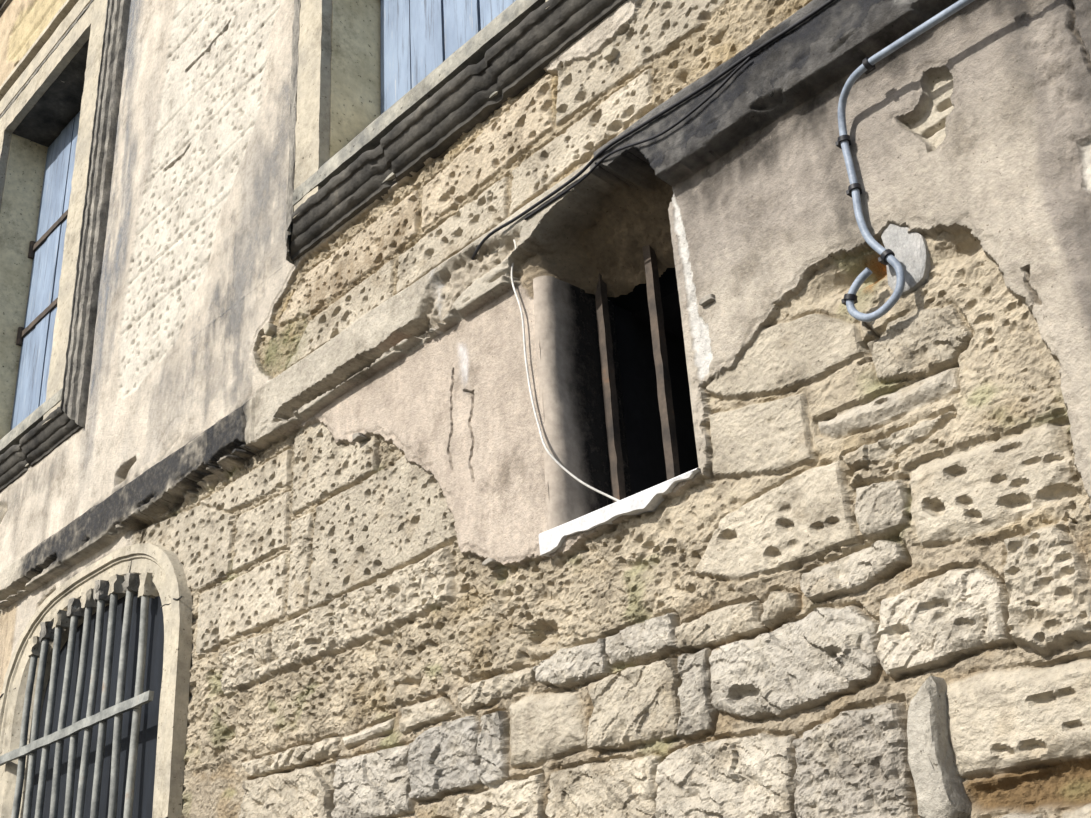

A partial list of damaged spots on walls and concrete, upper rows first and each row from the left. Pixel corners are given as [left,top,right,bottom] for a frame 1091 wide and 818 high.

spalling [117,0,284,399]
spalling [252,0,812,380]
spalling [894,65,955,153]
spalling [1076,135,1091,195]
spalling [114,455,137,487]
crack [447,367,475,483]
spalling [119,146,1091,818]